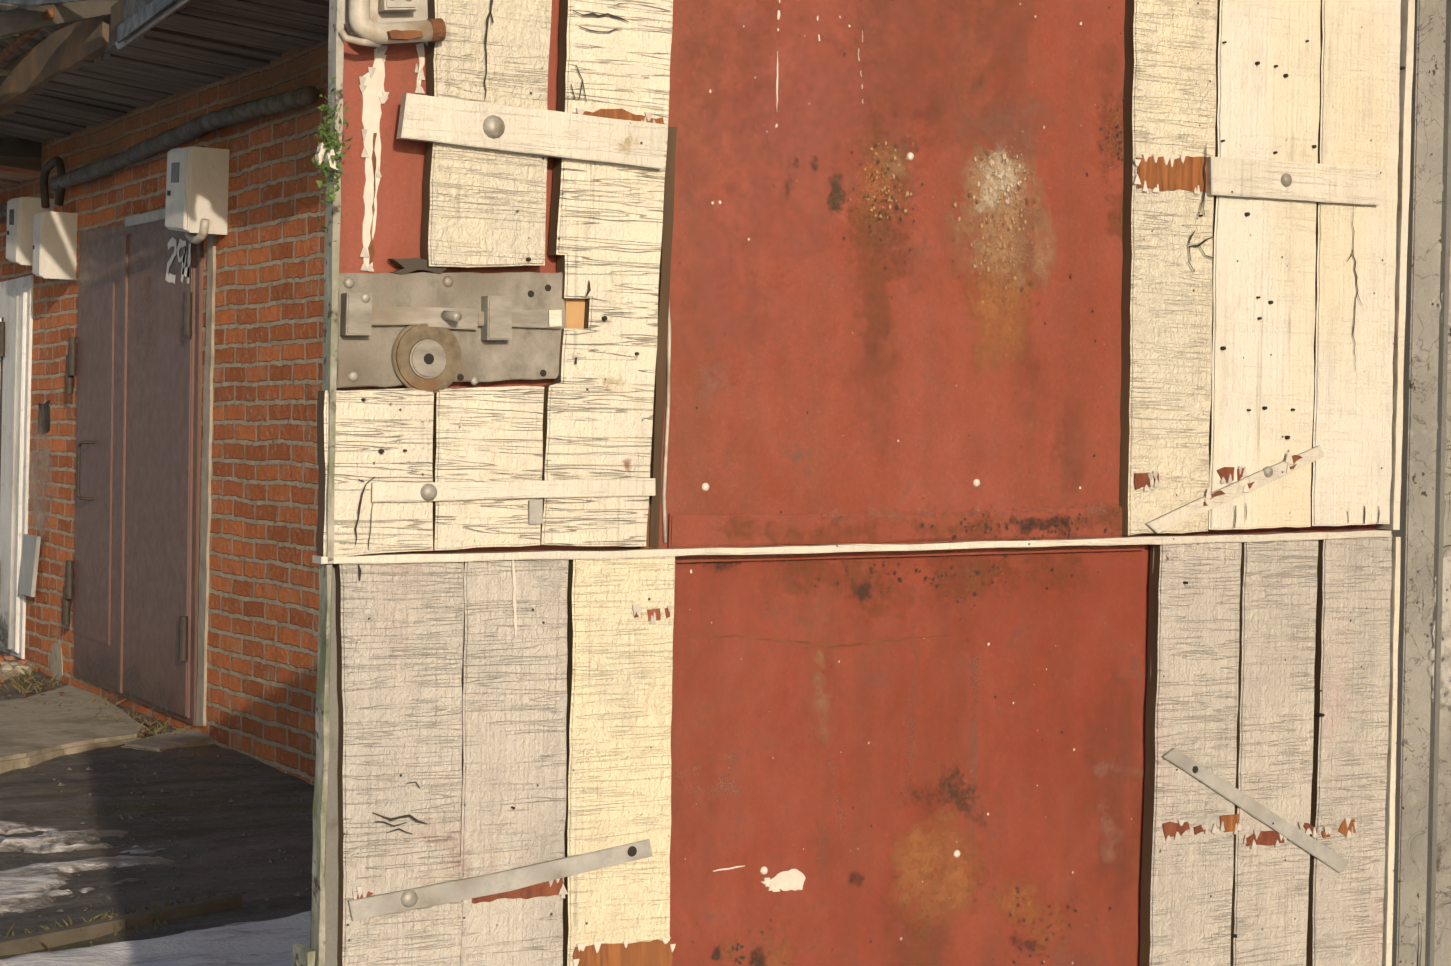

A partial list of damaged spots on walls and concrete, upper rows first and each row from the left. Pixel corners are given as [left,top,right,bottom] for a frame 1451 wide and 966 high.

crack [484,0,494,98]
peeling [358,44,389,272]
peeling [1134,154,1186,193]
peeling [1162,814,1357,849]
peeling [764,877,780,892]
peeling [572,941,602,966]